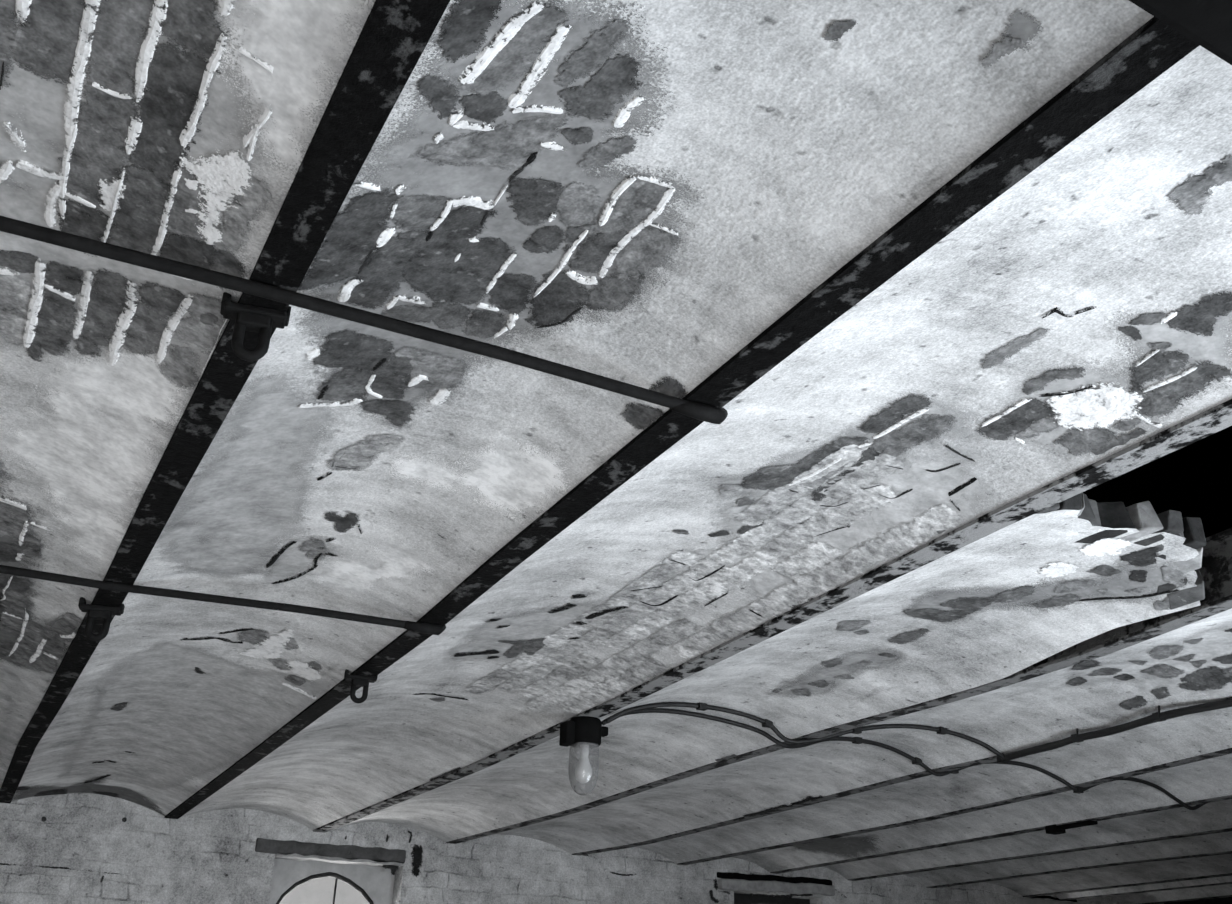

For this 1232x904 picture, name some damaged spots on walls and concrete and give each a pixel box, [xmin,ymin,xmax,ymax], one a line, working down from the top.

crack [0,61,8,90]
peeling [0,0,275,389]
peeling [295,0,715,481]
peeling [0,459,82,676]
peeling [258,512,363,586]
peeling [443,283,1232,715]